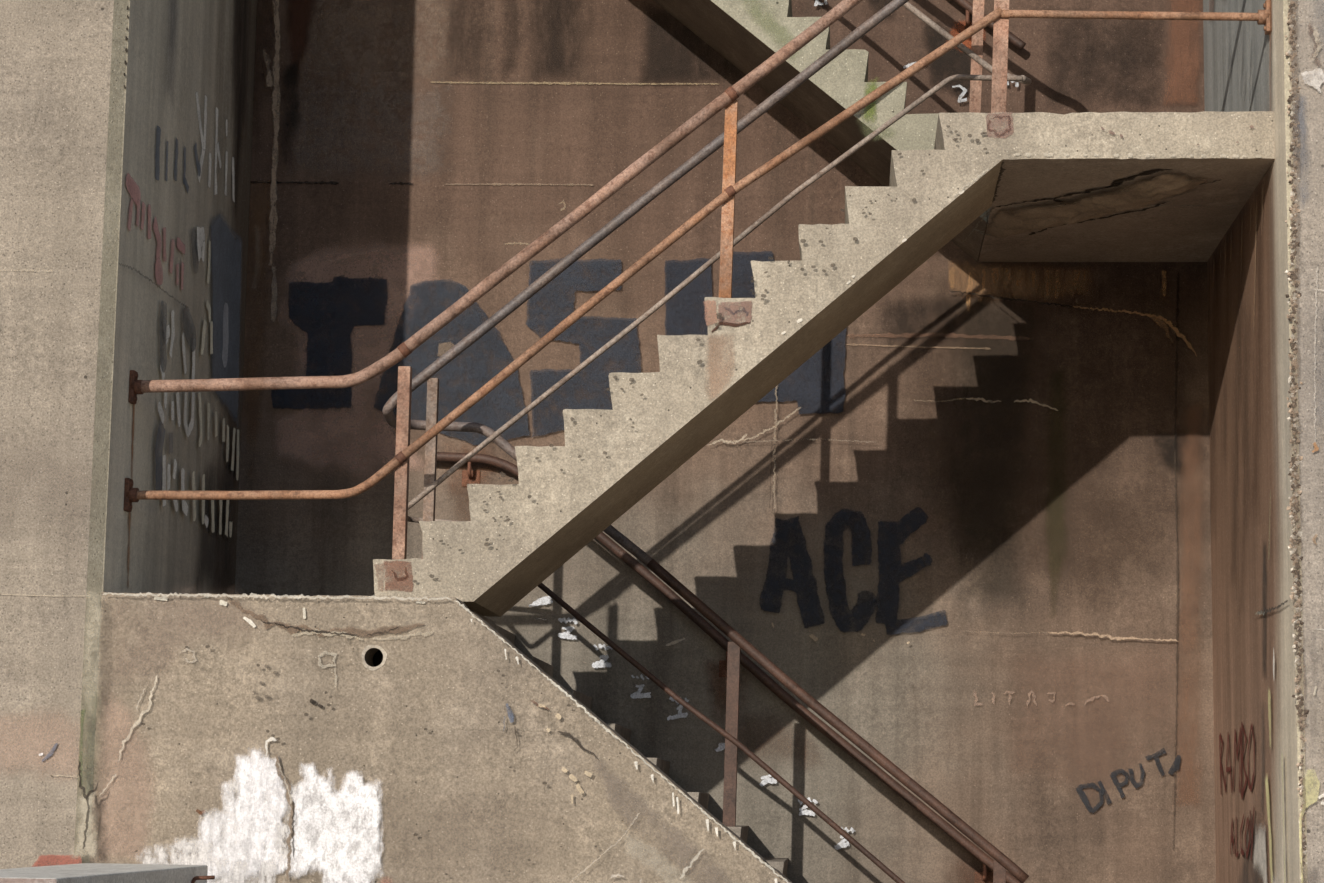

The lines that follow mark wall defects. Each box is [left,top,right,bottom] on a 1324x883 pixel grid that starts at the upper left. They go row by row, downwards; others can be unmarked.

water stain [646,13,738,80]
water stain [234,0,248,185]
crack [992,162,1006,202]
crack [950,291,1197,356]
water stain [199,469,232,577]
corrosion [384,561,413,592]
crack [226,596,430,640]
crack [51,676,157,849]
water stain [103,592,788,883]